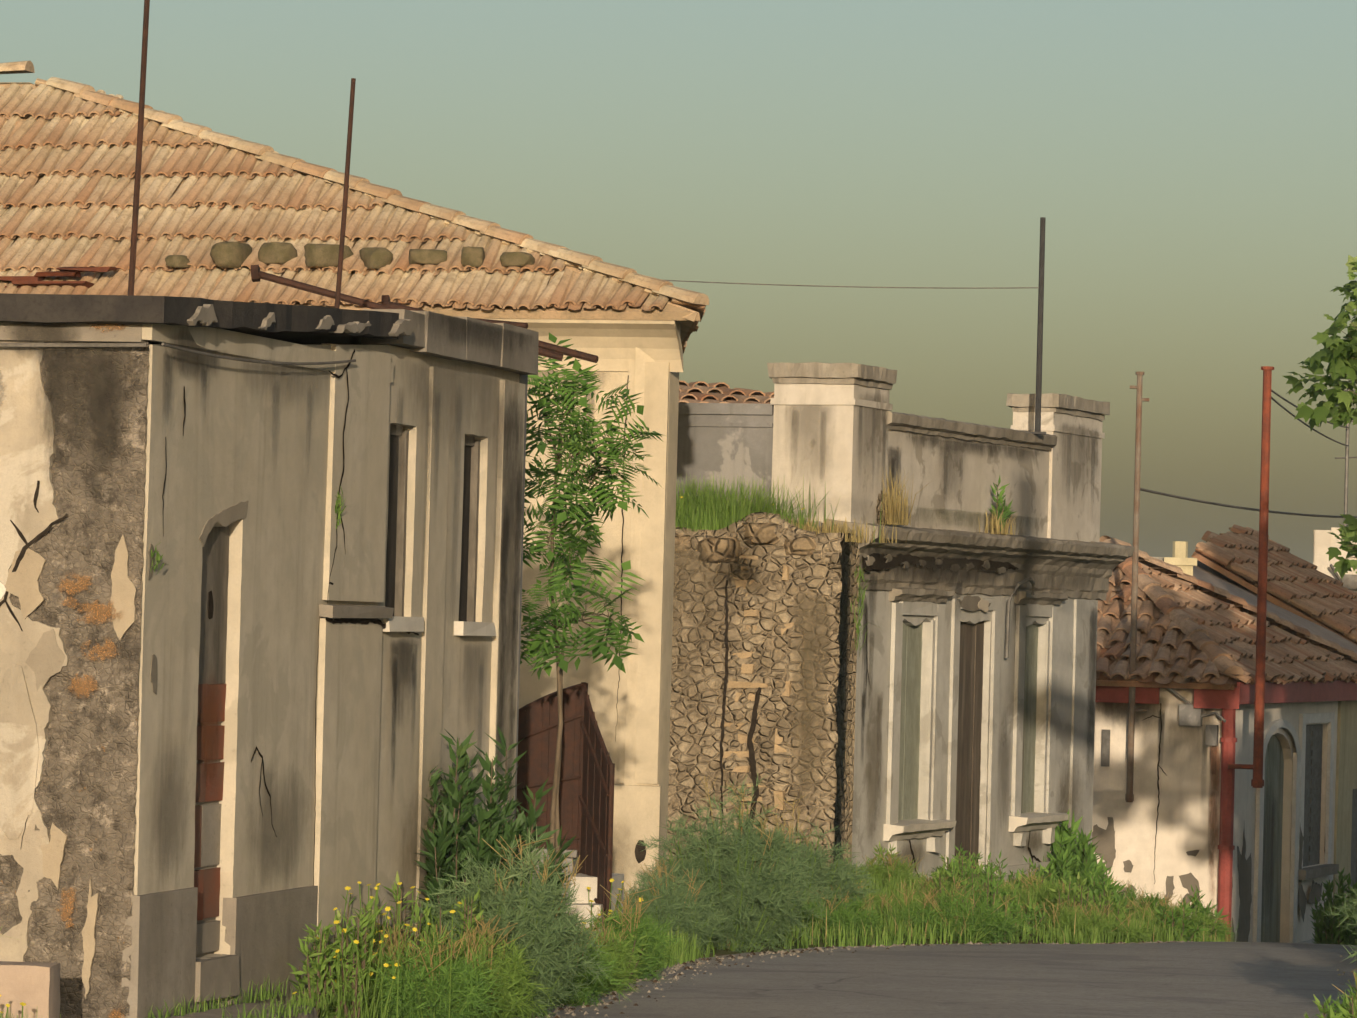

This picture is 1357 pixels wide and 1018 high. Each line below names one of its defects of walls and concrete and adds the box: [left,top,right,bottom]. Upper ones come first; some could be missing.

spalling [179,304,218,326]
spalling [258,312,276,330]
spalling [315,315,371,333]
spalling [388,319,414,337]
crack [0,480,68,631]
crack [313,349,419,886]
spalling [0,342,158,1018]
crack [251,746,277,837]
peeling [1092,817,1137,898]
peeling [1164,873,1201,916]
peeling [1231,821,1252,942]